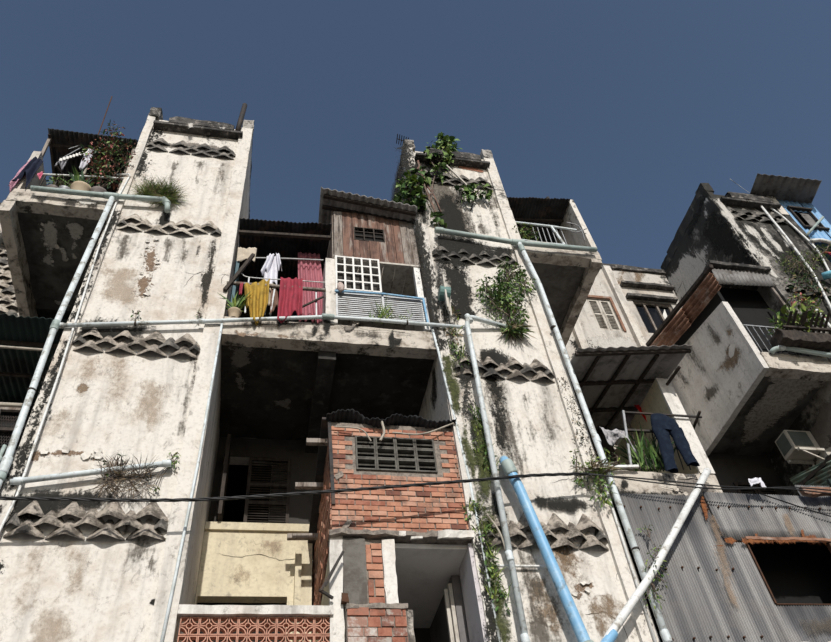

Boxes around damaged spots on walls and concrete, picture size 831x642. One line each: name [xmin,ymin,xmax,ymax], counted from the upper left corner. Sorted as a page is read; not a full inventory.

peeling [40,219,84,267]
leakage [0,210,158,522]
leakage [397,144,516,459]
leakage [668,194,813,300]
leakage [468,490,507,642]
corrosion [700,497,826,605]